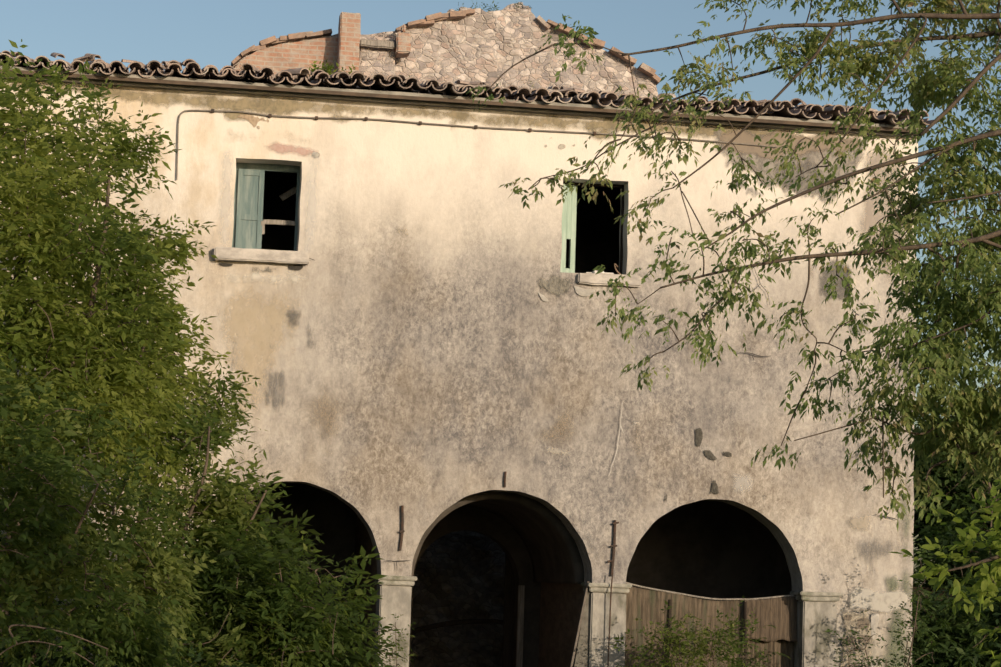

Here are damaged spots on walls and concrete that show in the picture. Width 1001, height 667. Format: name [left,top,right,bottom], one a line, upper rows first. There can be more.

flaking render [269,143,319,158]
water stain [225,295,300,410]
spalling [695,428,732,460]